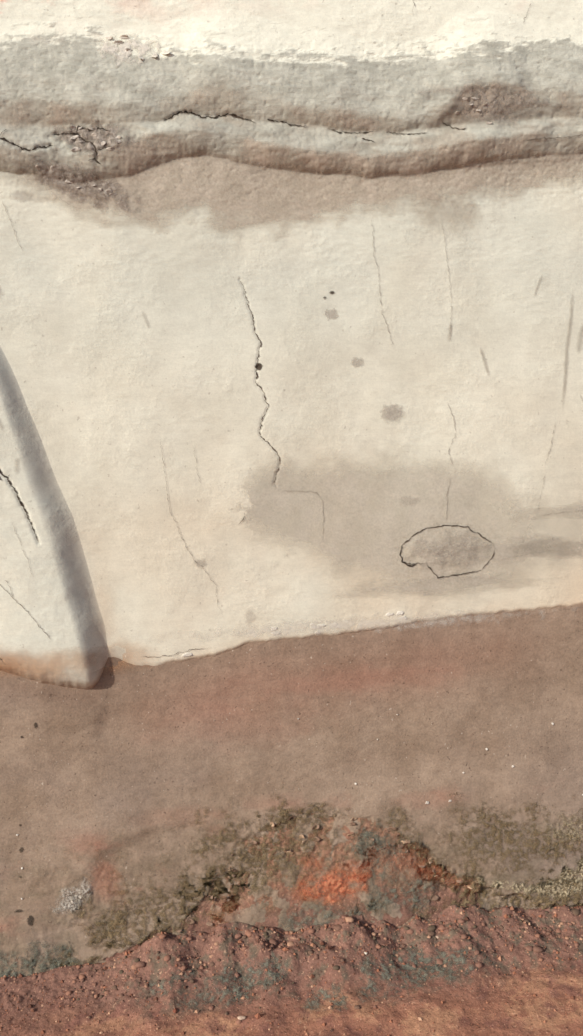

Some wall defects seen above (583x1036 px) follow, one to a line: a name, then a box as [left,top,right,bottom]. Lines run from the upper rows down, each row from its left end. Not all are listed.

crack [0,126,111,164]
leakage [34,139,583,228]
crack [164,111,466,142]
crack [239,279,325,538]
crack [0,470,53,642]
leakage [247,468,537,581]
crack [399,405,494,578]
spalling [106,813,481,961]